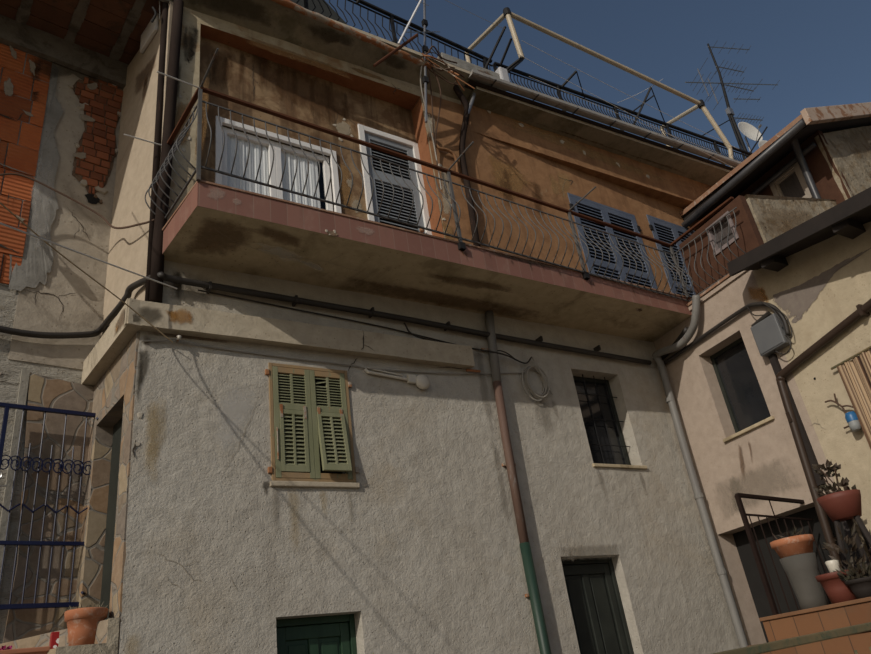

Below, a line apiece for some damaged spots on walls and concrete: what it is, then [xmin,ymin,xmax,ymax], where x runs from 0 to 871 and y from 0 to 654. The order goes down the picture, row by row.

spalling [80,180,108,204]